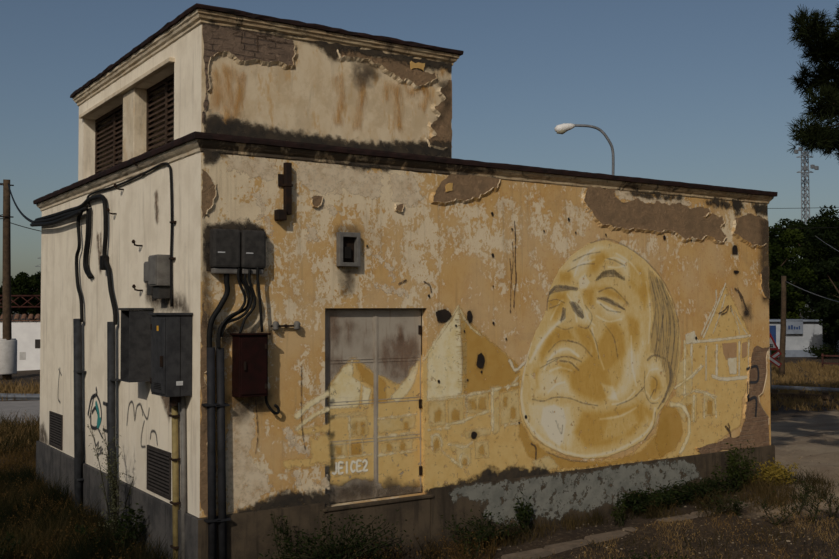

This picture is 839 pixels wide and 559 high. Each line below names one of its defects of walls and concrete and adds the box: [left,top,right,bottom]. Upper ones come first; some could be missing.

spalling [202,23,299,123]
damp [208,21,452,106]
spalling [202,169,218,218]
damp [203,149,227,164]
damp [204,114,451,158]
damp [343,162,390,171]
peeling [296,161,501,215]
damp [630,190,682,200]
spalling [581,186,769,254]
spalling [436,309,473,333]
spalling [695,346,770,454]
peeling [449,460,702,525]